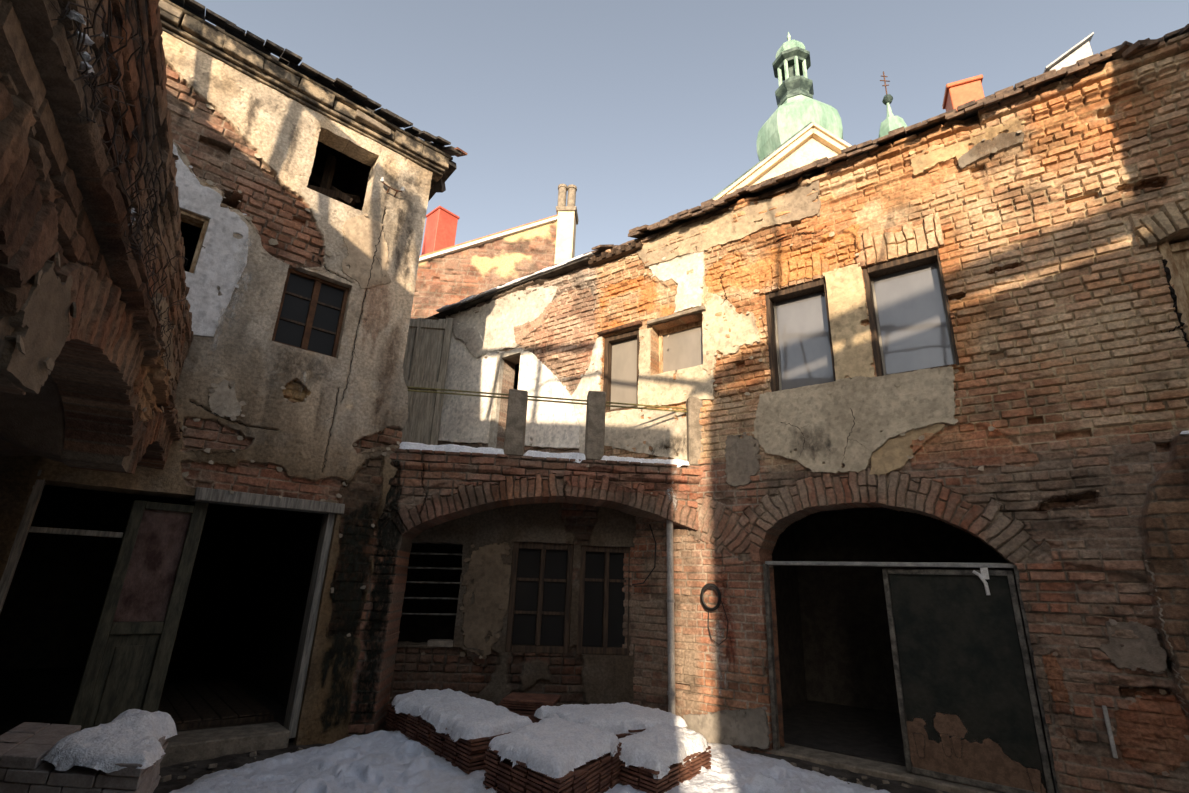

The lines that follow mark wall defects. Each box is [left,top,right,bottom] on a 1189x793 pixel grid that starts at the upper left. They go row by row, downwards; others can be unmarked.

flaking render [0,251,77,394]
spalling [164,59,391,337]
crack [318,208,387,472]
flaking render [438,180,1040,496]
spalling [180,377,402,639]
spalling [1100,618,1189,777]